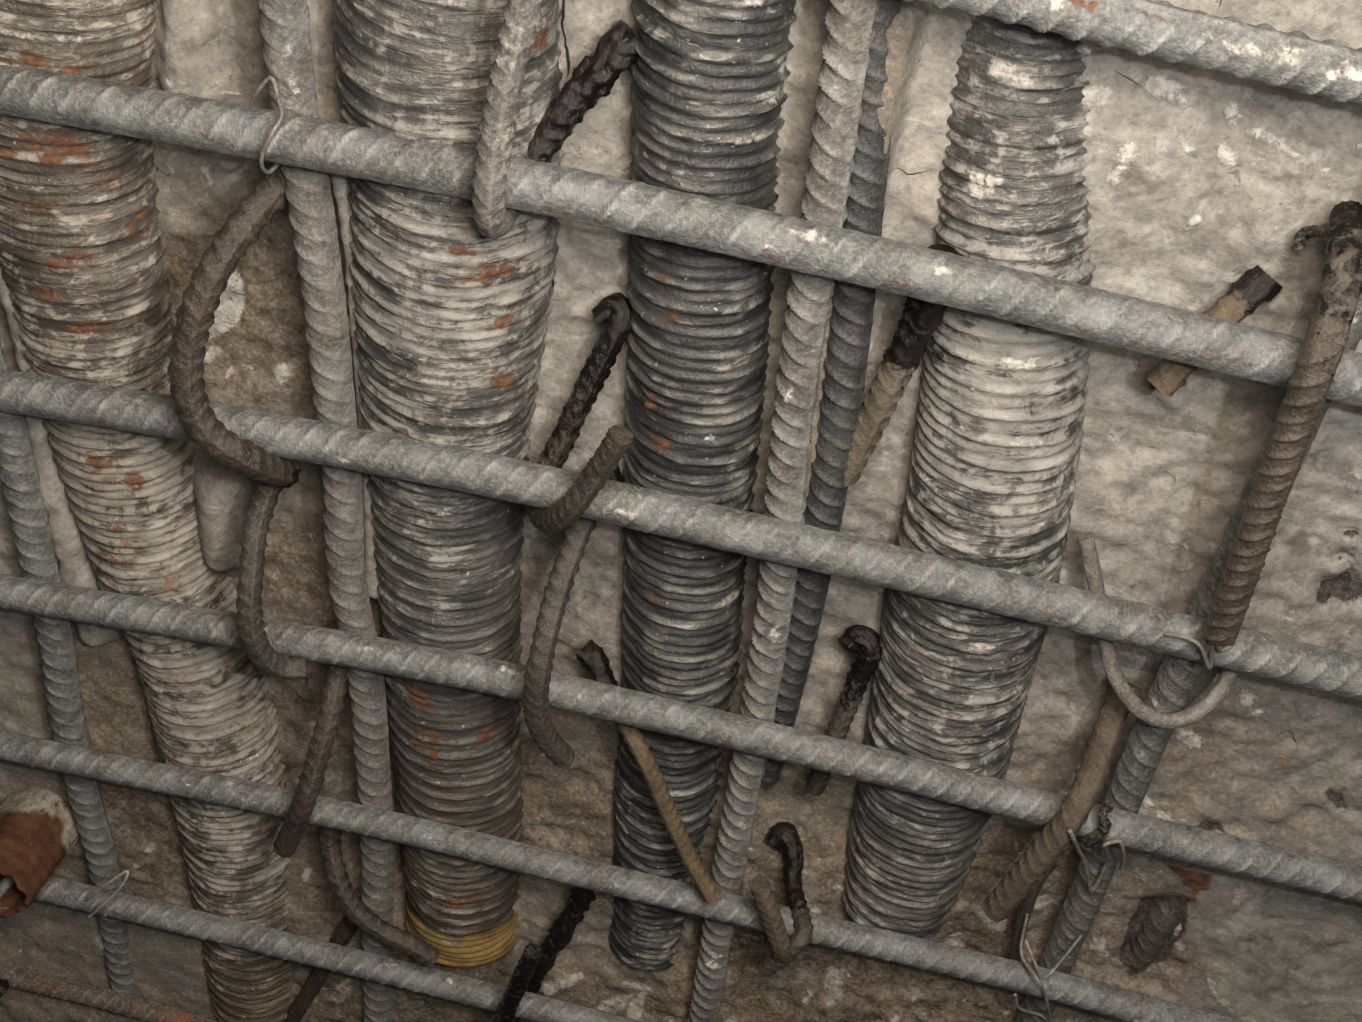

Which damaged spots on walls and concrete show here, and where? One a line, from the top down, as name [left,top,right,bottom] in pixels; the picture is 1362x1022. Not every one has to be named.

spalling [0,0,765,1022]
spalling [778,904,796,938]
spalling [505,0,1362,895]
spalling [809,718,1362,1022]